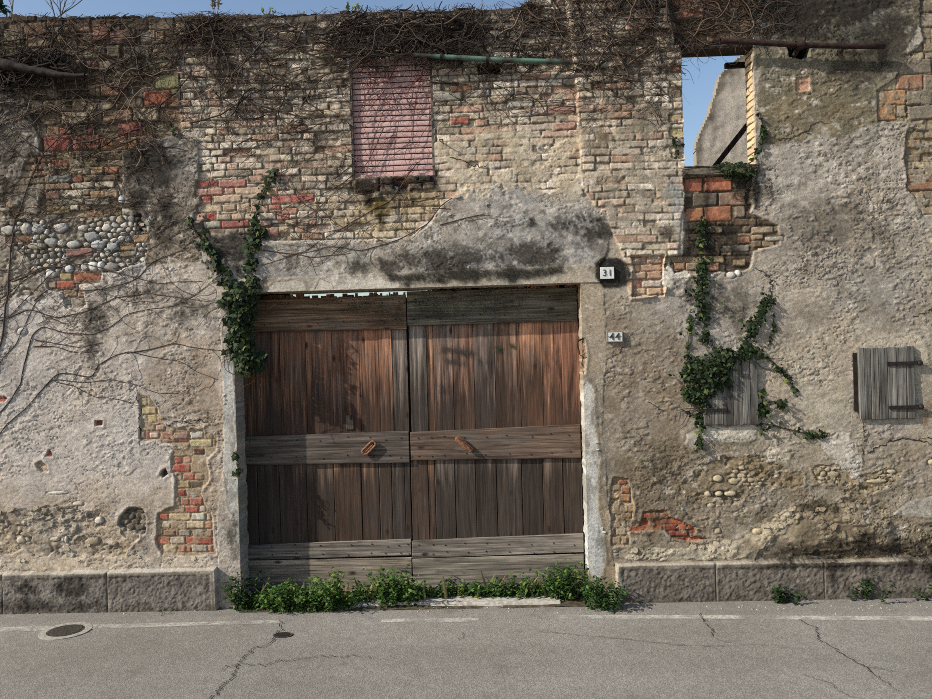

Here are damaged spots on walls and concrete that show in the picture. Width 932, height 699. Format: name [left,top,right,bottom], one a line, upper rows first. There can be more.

crack [779,121,832,141]
flaking render [877,0,932,212]
flaking render [4,213,148,308]
damp [349,240,563,287]
damp [549,215,612,241]
flaking render [0,362,239,572]
flaking render [582,334,932,579]
crack [862,422,932,462]